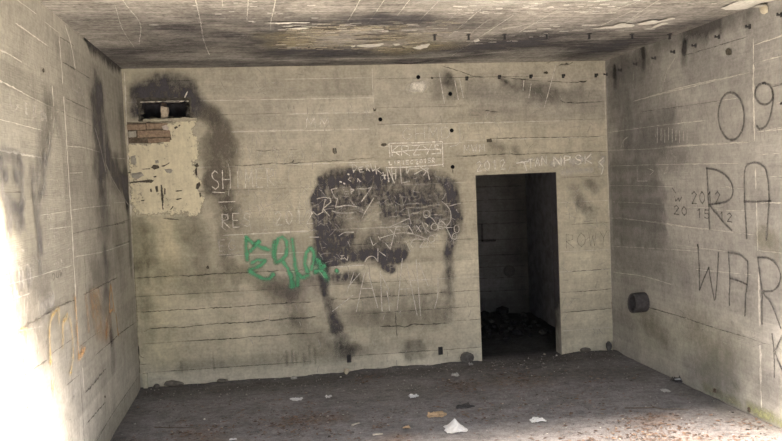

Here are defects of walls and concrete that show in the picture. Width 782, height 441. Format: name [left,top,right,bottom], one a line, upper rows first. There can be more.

peeling [721,0,773,14]
flaking render [127,97,205,220]